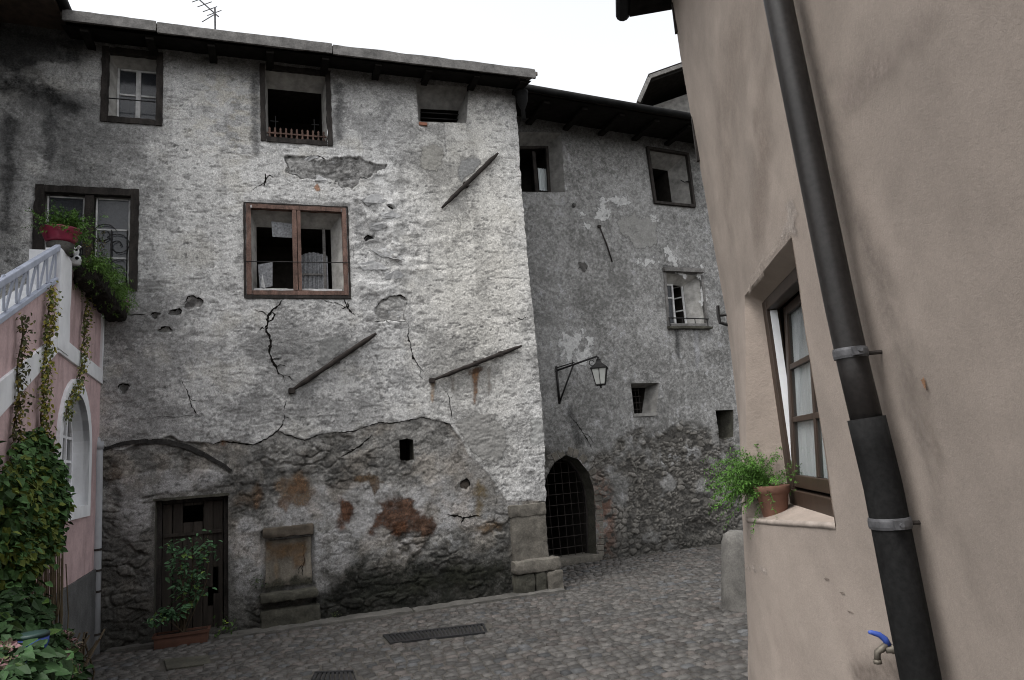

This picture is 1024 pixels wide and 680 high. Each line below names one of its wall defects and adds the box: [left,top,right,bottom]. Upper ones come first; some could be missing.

damp [0,23,79,161]
damp [1,117,17,231]
spalling [285,155,387,188]
peeling [572,195,631,230]
spalling [151,295,203,332]
crack [209,300,452,458]
corrosion [469,367,490,403]
corrosion [275,472,314,511]
corrosion [338,499,354,529]
corrosion [354,474,436,536]